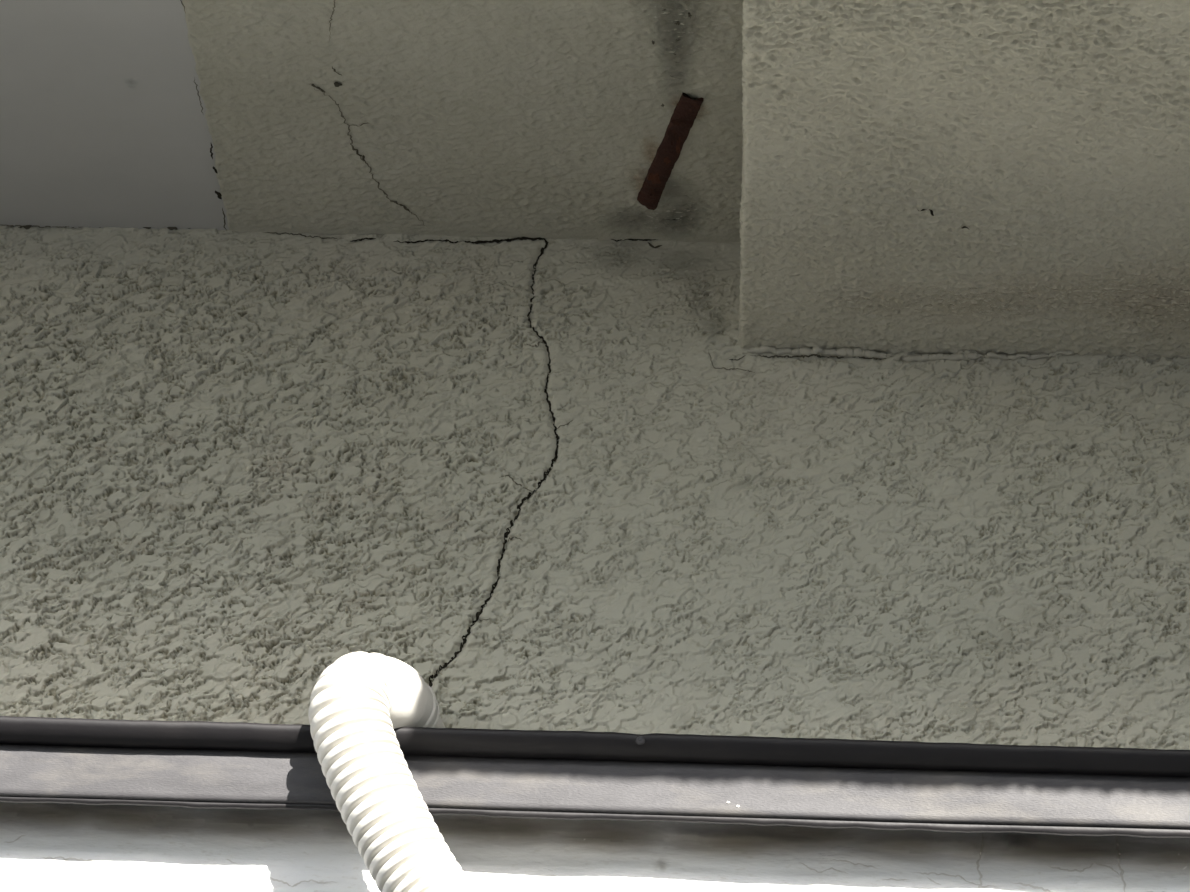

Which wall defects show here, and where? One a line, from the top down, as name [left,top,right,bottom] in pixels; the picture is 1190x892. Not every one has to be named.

crack [263,0,574,687]
crack [705,832,1164,892]